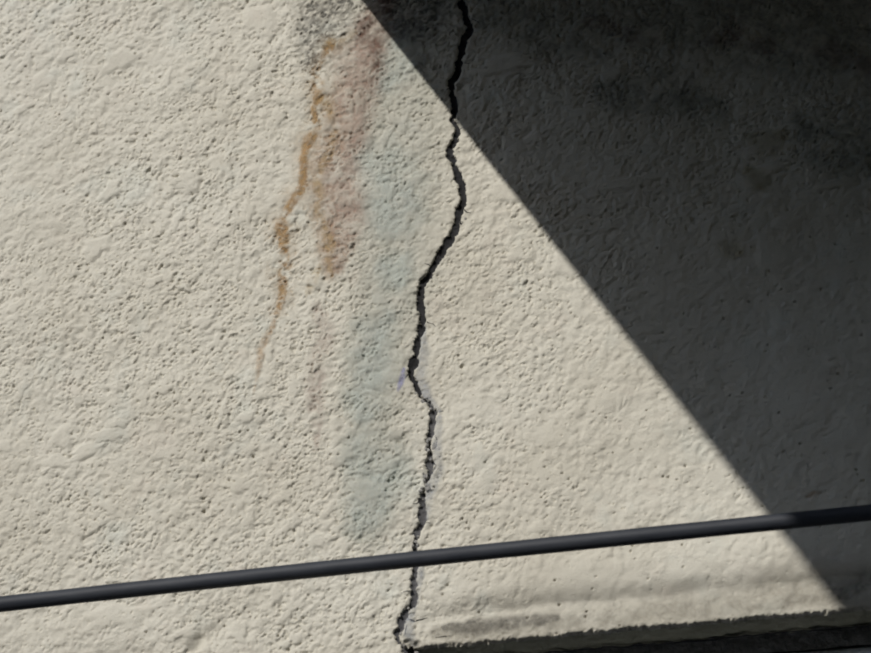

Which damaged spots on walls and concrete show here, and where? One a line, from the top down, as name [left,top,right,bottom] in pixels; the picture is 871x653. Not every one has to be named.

corrosion [286,134,316,208]
crack [393,0,480,653]
crack [548,625,871,653]